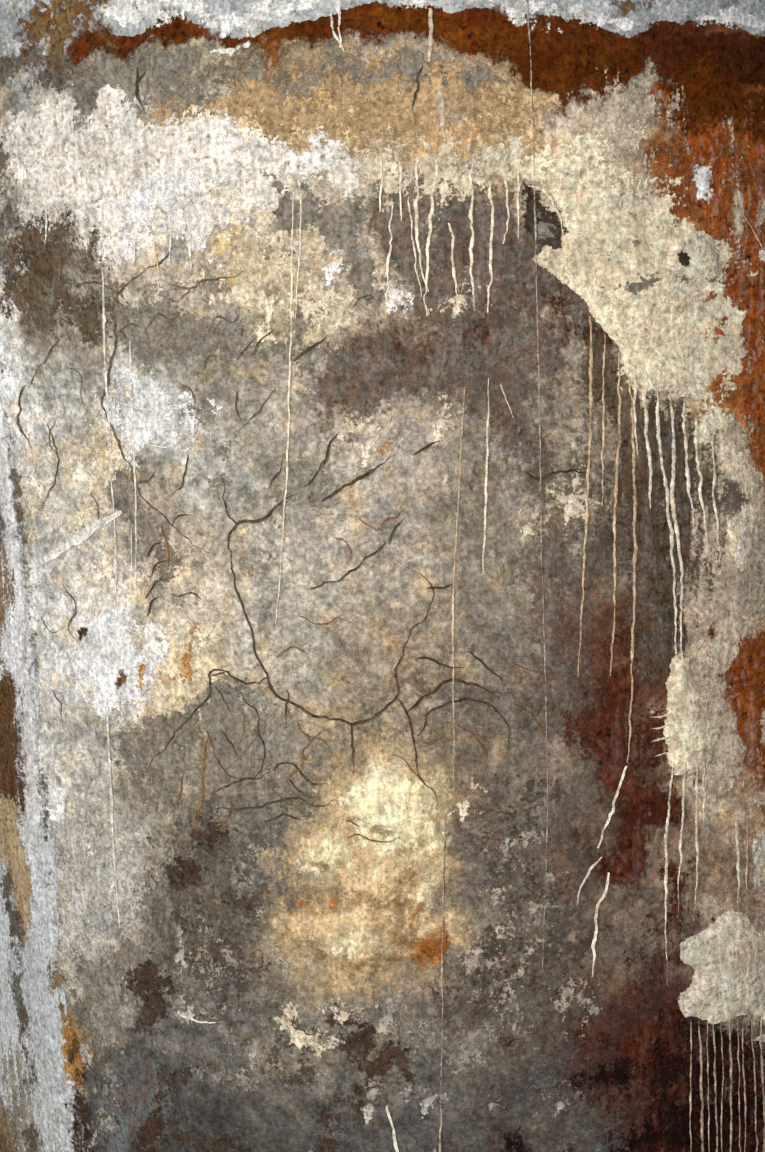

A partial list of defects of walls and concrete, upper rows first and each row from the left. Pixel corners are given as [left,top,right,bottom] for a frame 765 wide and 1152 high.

corrosion [115,664,146,690]
water stain [0,796,336,1152]
corrosion [166,621,198,685]
corrosion [164,814,229,891]
crack [16,247,557,843]
water stain [0,9,727,763]
corrosion [1,0,765,506]
water stain [355,762,765,1152]
corrosion [552,612,714,1115]
corrosion [707,631,765,814]